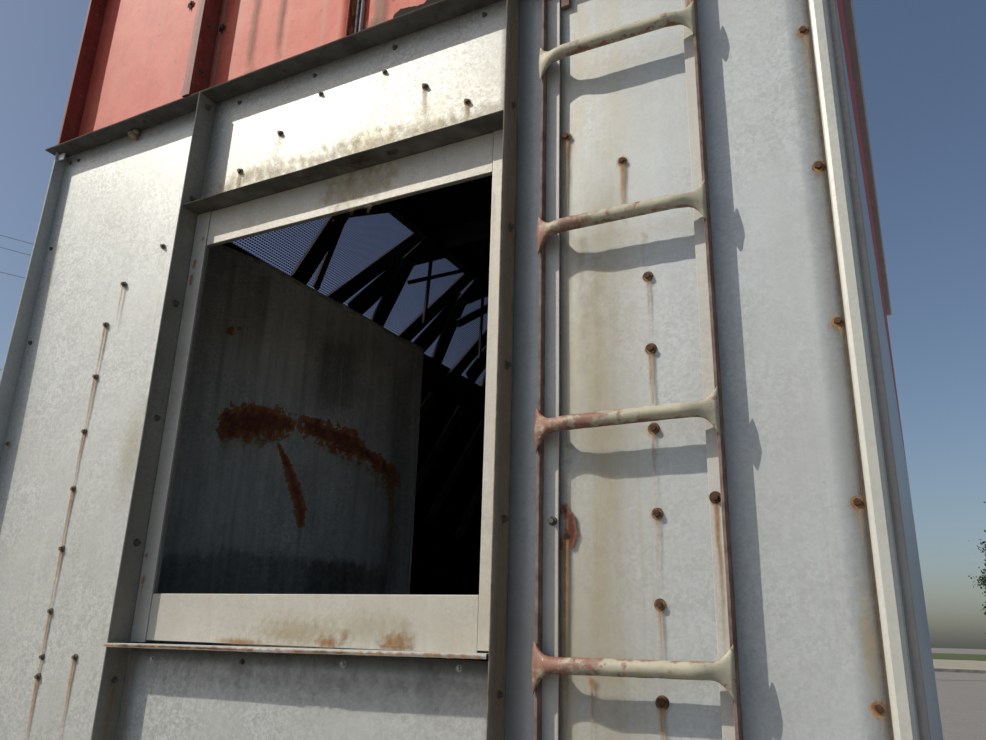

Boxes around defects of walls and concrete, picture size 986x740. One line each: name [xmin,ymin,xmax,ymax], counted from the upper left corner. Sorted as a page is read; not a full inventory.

rust [617,160,626,203]
rust [27,326,106,734]
rust [216,401,401,561]
rust [560,504,577,657]